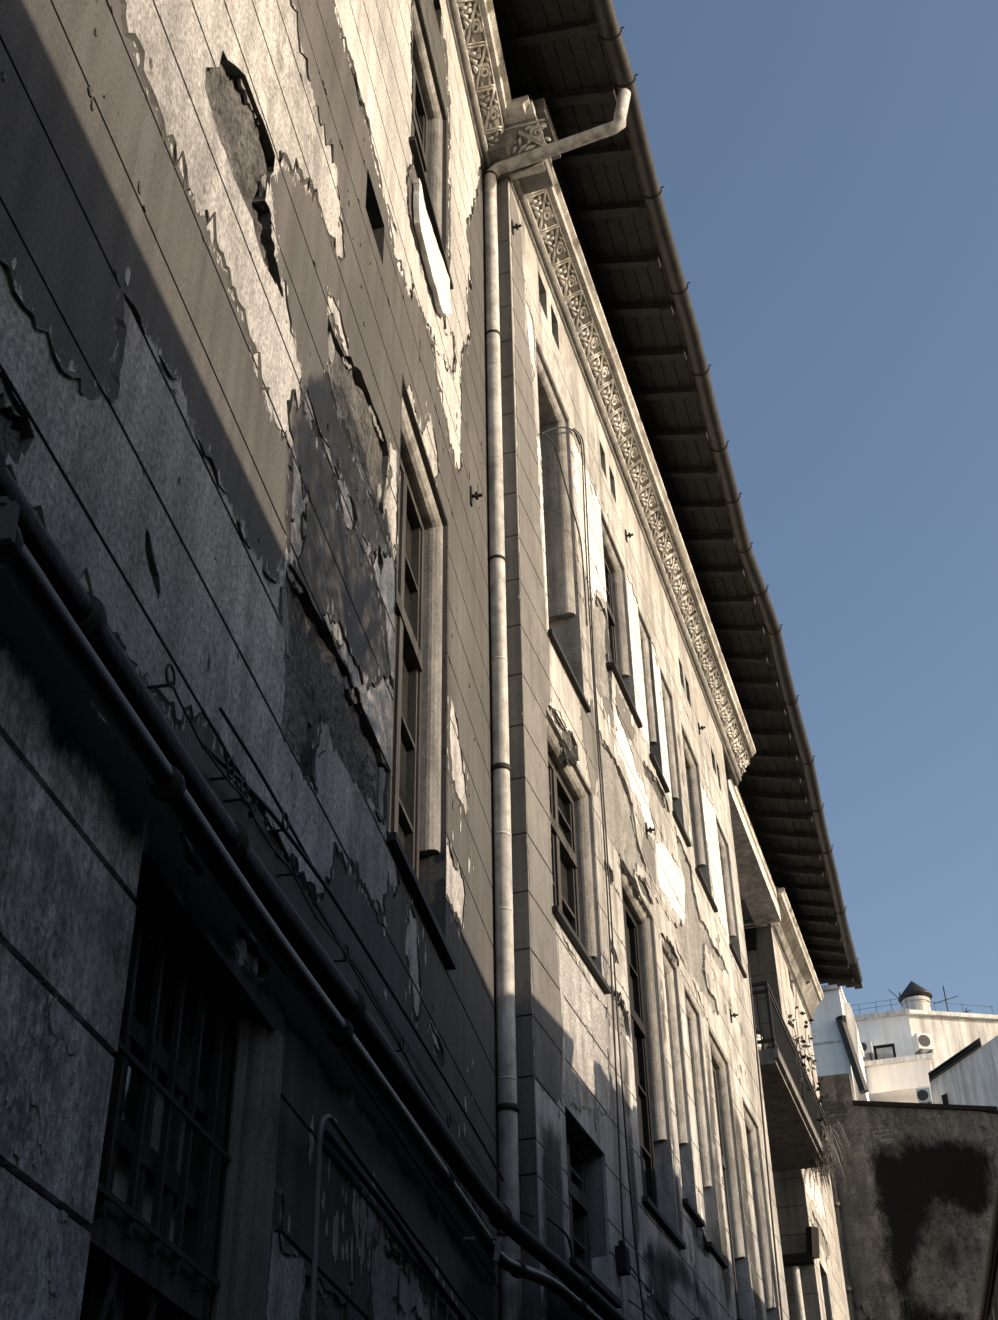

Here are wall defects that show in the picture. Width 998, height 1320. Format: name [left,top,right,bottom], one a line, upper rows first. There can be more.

peeling [332,0,482,491]
peeling [0,0,444,1068]
peeling [446,690,476,942]
peeling [265,1157,469,1320]